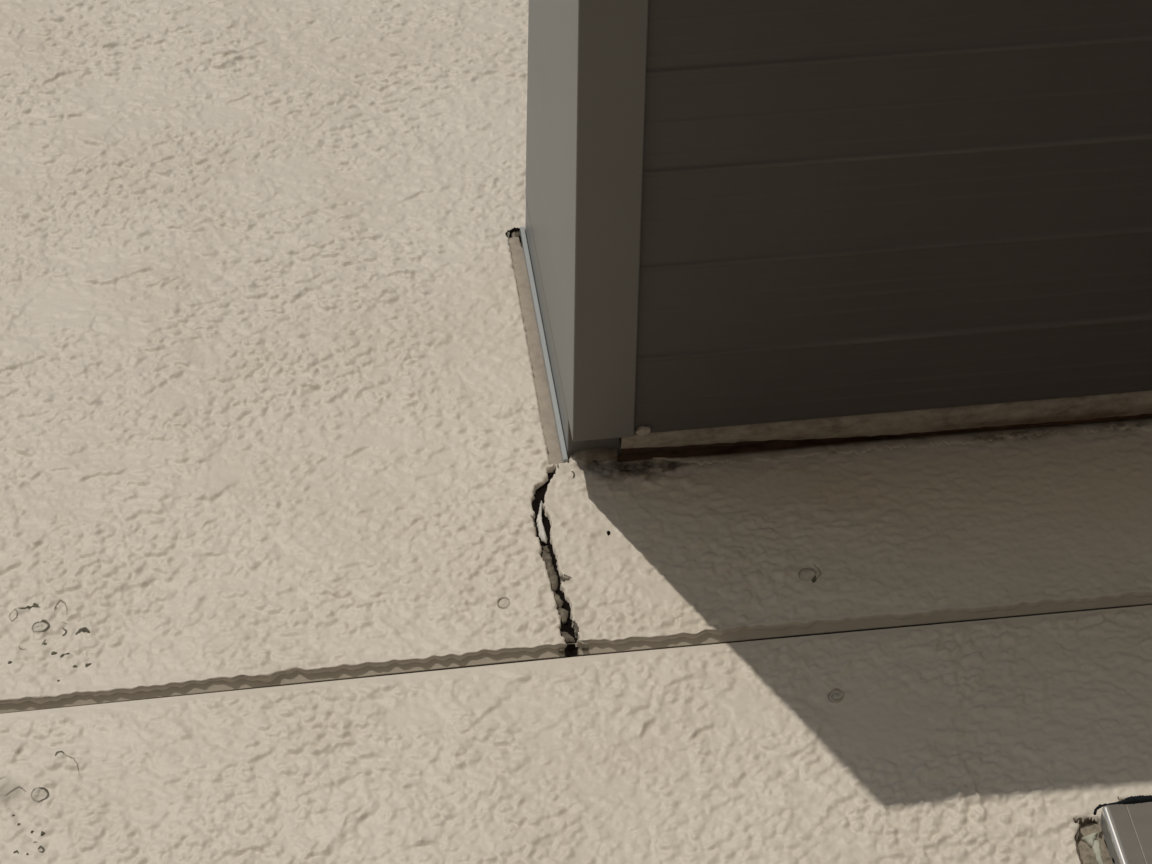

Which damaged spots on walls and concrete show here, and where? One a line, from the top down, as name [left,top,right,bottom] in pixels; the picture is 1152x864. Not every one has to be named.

crack [530,465,589,658]